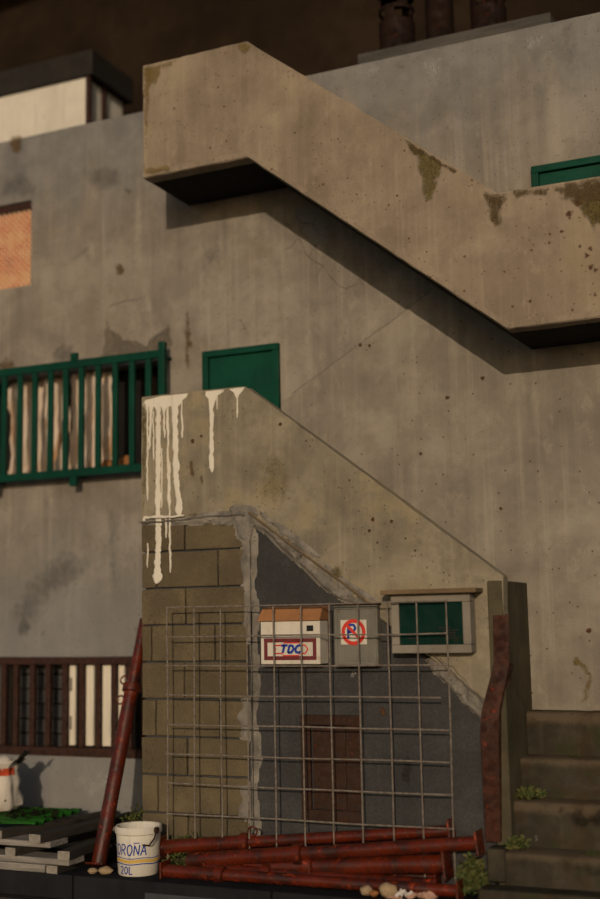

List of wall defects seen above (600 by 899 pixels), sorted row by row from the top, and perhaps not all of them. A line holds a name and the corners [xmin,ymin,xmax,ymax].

peeling [104,323,174,356]
water stain [143,394,218,584]
spalling [140,505,378,836]